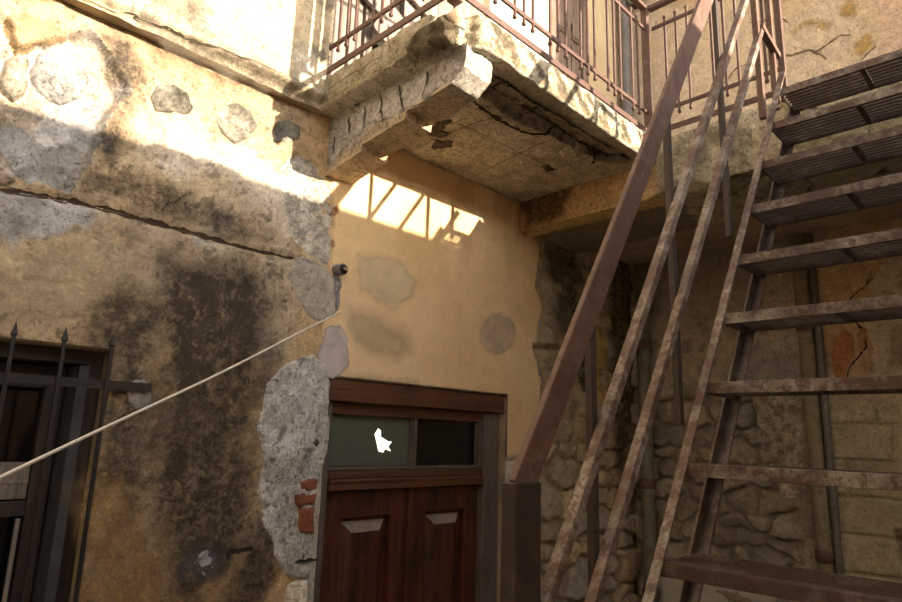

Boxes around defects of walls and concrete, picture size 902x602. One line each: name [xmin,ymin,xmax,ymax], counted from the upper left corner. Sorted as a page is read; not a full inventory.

flaking render [0,11,134,253]
flaking render [216,102,257,146]
flaking render [270,120,302,146]
peeling [327,14,459,163]
crack [413,82,625,177]
crack [723,34,851,83]
crack [0,185,295,260]
flaking render [281,156,333,266]
crack [847,323,867,377]
water stain [0,238,277,602]
flaking render [294,478,318,534]